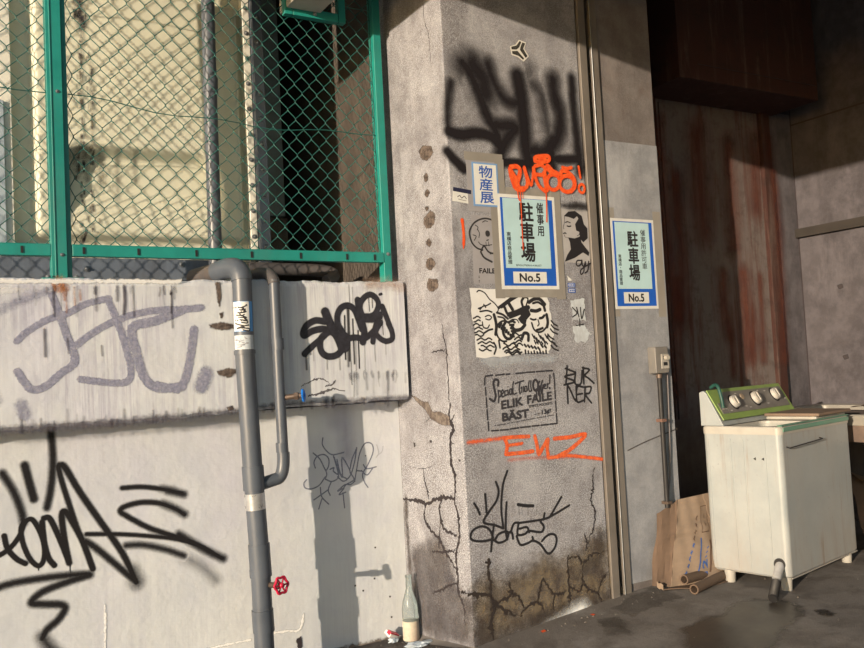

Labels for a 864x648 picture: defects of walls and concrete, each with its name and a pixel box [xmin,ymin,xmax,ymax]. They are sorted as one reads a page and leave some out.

damp [74,0,87,28]
damp [75,93,94,211]
damp [1,410,237,432]
crack [403,325,606,640]
damp [357,497,612,648]